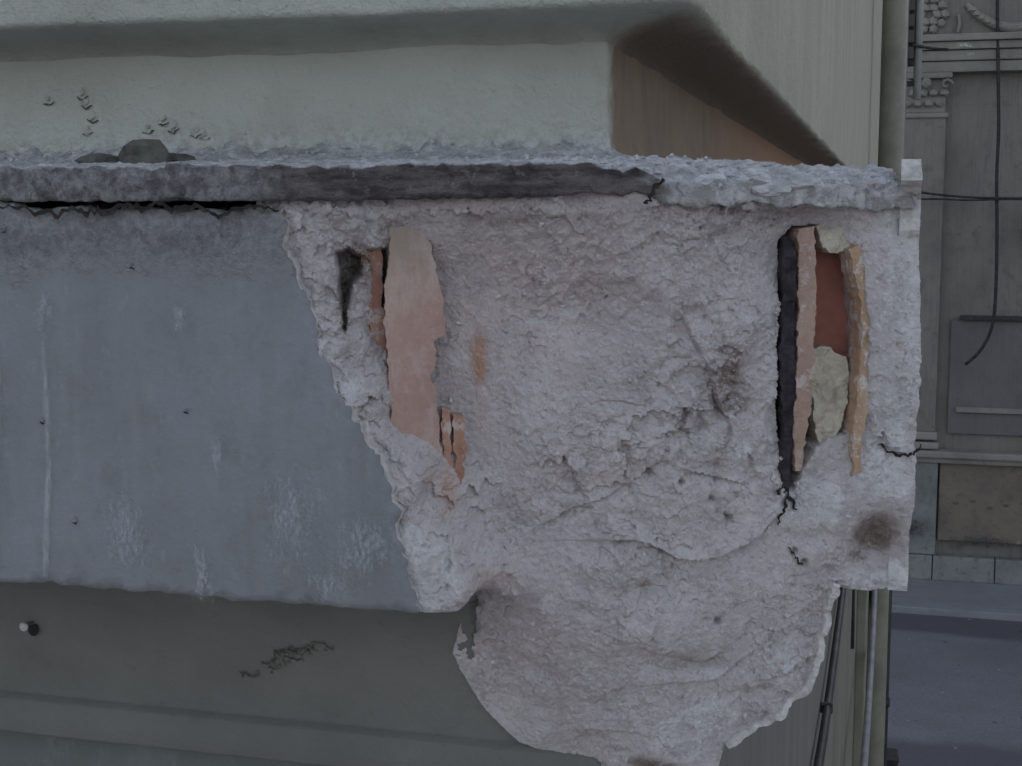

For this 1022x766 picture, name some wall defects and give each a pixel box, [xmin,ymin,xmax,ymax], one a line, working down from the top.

spalling [256,192,922,766]